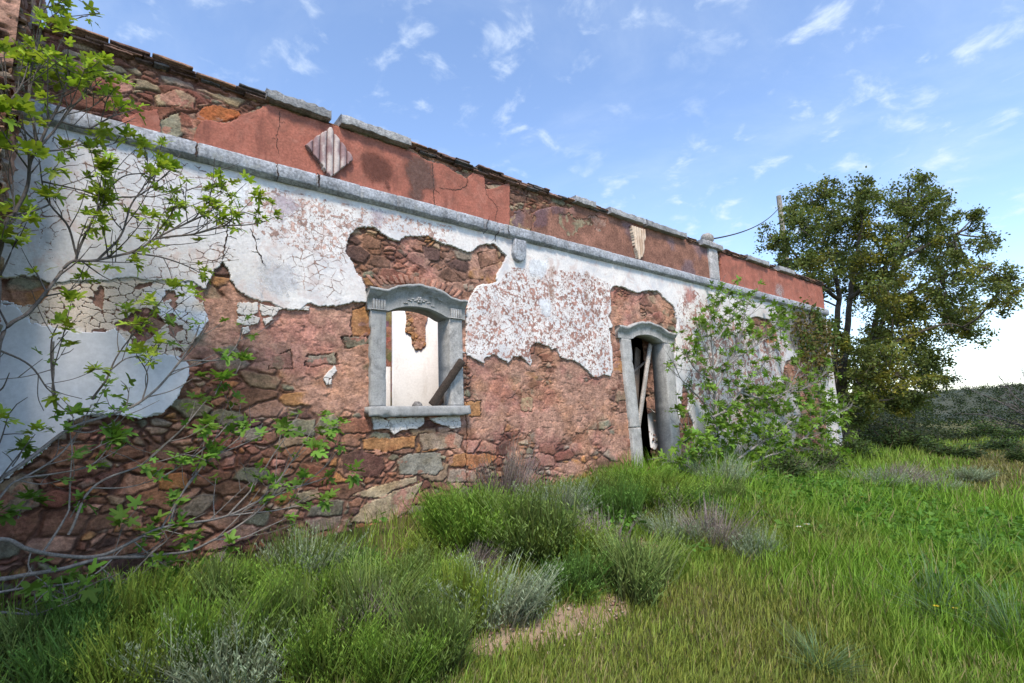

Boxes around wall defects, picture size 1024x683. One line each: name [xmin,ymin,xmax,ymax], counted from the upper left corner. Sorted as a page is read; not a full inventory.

leakage [361,153,392,189]
leakage [406,156,435,200]
crack [14,128,363,301]
crack [432,163,510,242]
spalling [509,207,536,230]
spalling [558,213,607,238]
peeling [3,277,208,356]
peeling [236,302,309,334]
peeling [467,267,611,377]
peeling [323,366,337,385]
peeling [371,415,461,435]